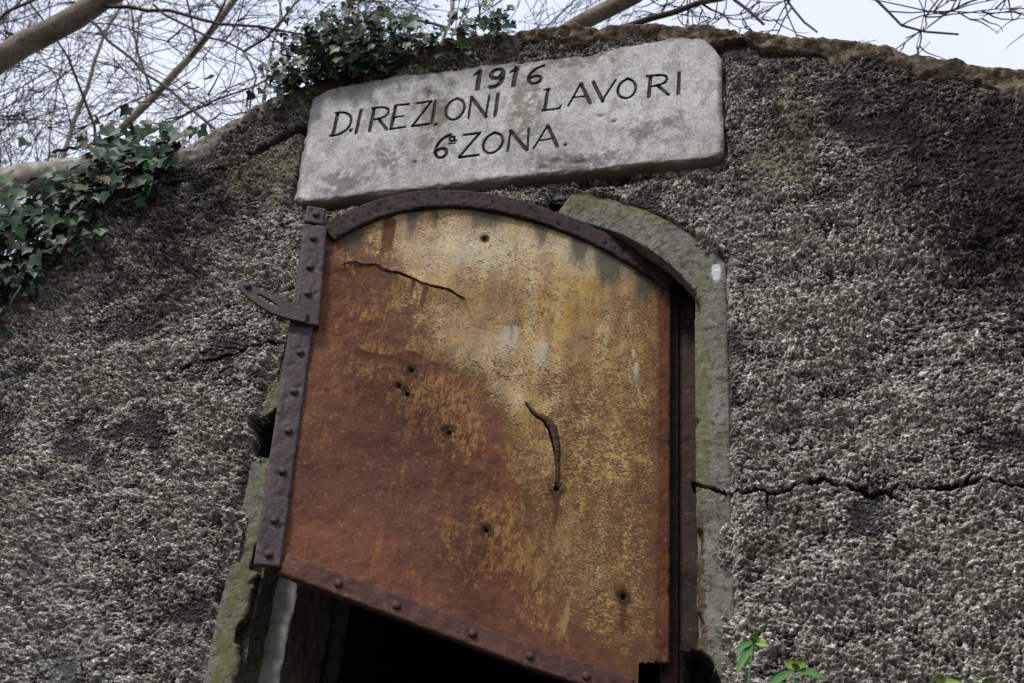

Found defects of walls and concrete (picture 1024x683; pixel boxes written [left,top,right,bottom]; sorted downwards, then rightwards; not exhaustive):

rust [381,216,396,254]
rust [278,256,502,632]
crack [691,471,1024,508]